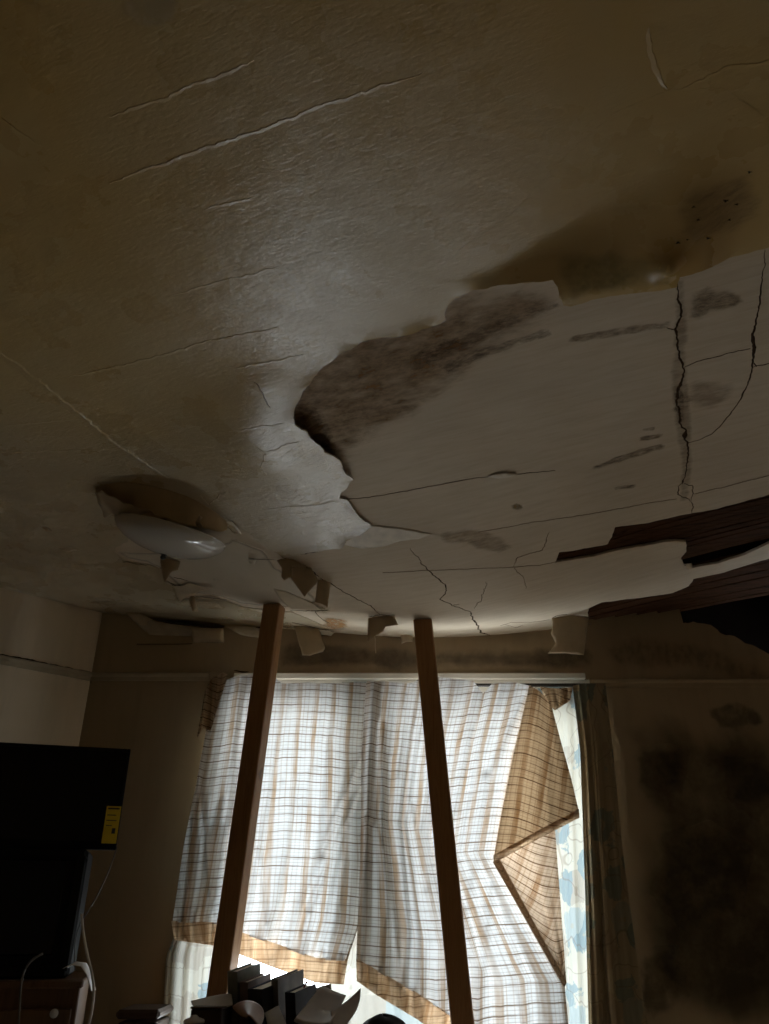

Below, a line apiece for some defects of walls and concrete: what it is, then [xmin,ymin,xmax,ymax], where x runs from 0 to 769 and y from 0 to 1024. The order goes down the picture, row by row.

peeling [0,0,769,643]
damp [296,301,542,452]
crack [353,477,485,499]
crack [383,252,769,635]
damp [658,743,769,1016]